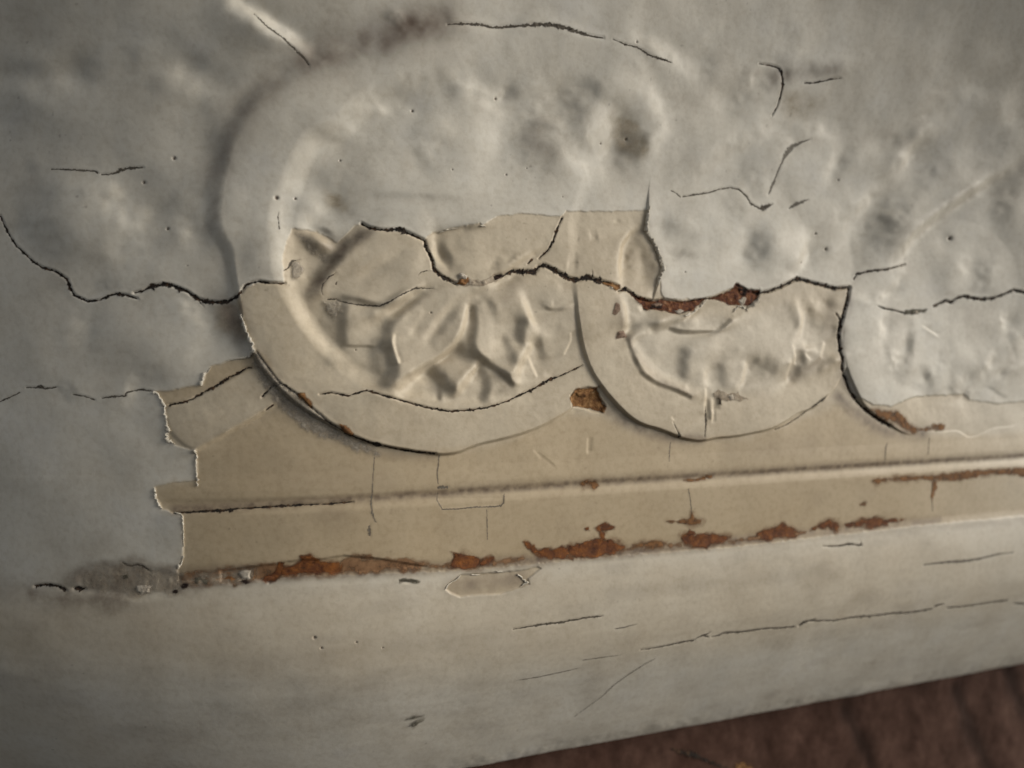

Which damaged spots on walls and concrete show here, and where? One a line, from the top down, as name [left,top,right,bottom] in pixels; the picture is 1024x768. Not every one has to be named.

crack [448,22,671,63]
crack [0,216,297,305]
crack [321,223,456,307]
crack [503,218,648,302]
peeling [436,206,760,333]
peeling [86,305,380,597]
crack [0,352,582,539]
flaking render [570,387,606,413]
flaking render [714,390,746,404]
corrosion [875,409,945,433]
peeling [445,567,540,597]
corrosion [180,514,903,586]